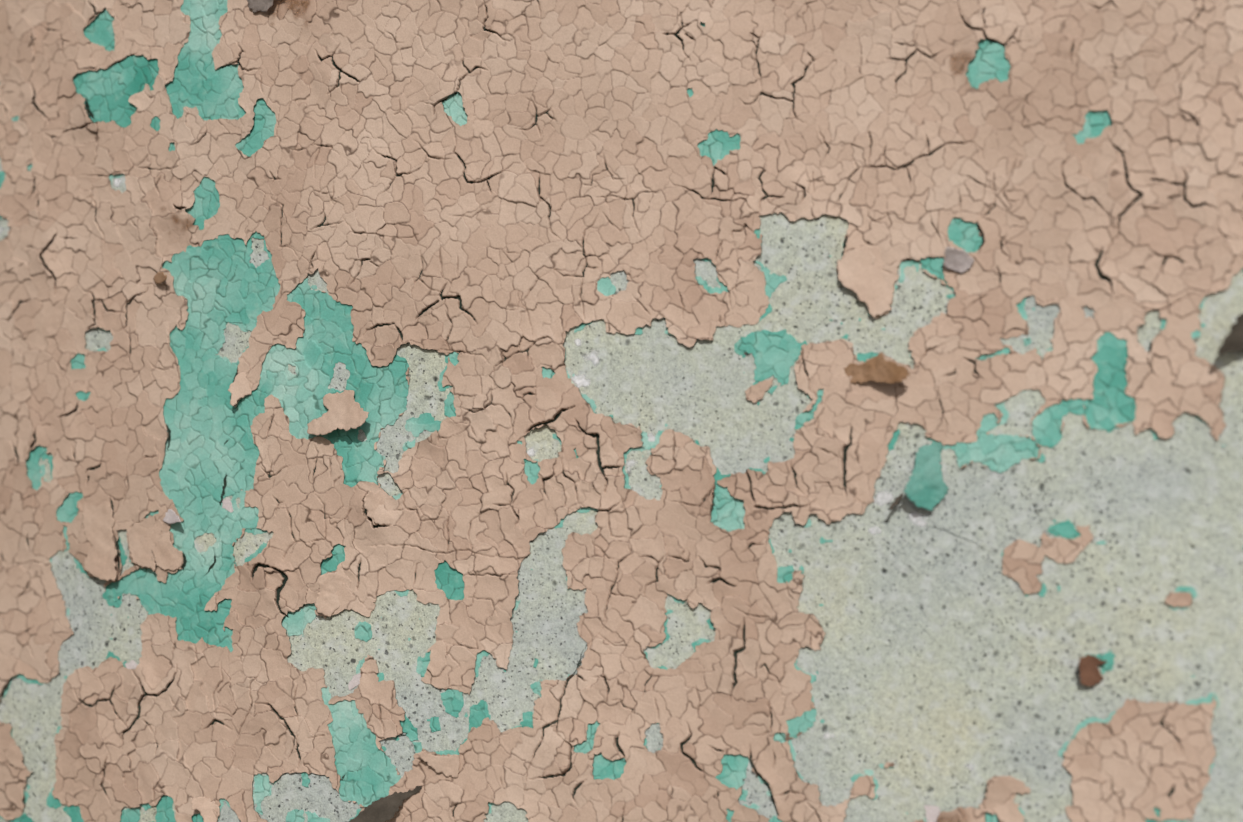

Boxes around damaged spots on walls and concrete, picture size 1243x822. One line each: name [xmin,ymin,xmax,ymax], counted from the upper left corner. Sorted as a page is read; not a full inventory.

peeling [73,0,276,157]
crack [1063,147,1206,287]
crack [369,261,475,353]
spalling [542,212,983,532]
peeling [0,175,459,822]
crack [252,563,288,617]
spalling [253,510,598,822]
crack [469,392,618,525]
spalling [517,425,579,484]
crack [534,644,652,799]
crack [681,735,790,815]
spalling [768,270,1243,822]